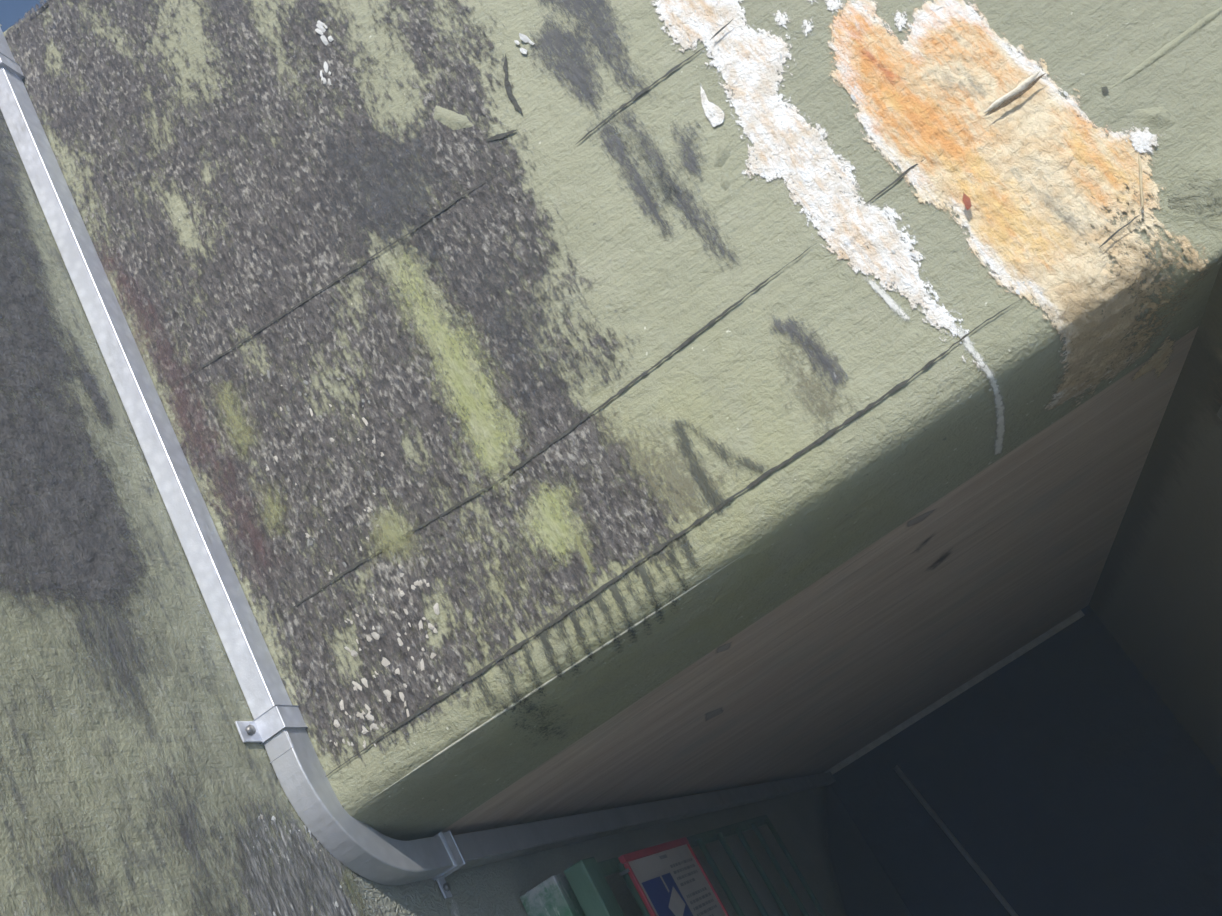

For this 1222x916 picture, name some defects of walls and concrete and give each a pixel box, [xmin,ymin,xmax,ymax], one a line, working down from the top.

damp [0,0,764,765]
damp [530,0,1005,455]
corrosion [827,0,1216,411]